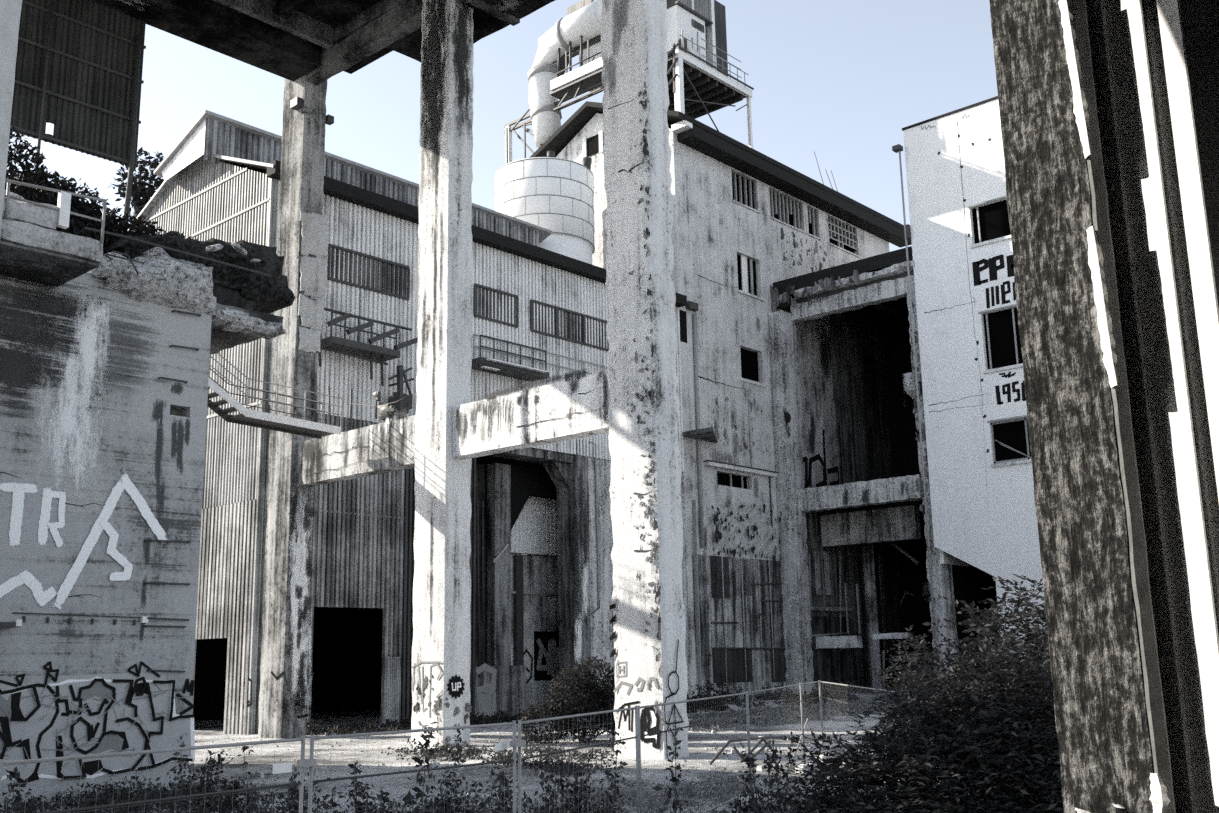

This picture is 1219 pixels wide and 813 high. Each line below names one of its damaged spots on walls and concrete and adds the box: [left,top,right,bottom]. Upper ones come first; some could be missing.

water stain [606,0,628,94]
spalling [91,247,286,340]
water stain [0,284,143,485]
water stain [343,409,406,465]
water stain [456,370,586,445]
water stain [712,433,737,464]
water stain [286,489,318,715]